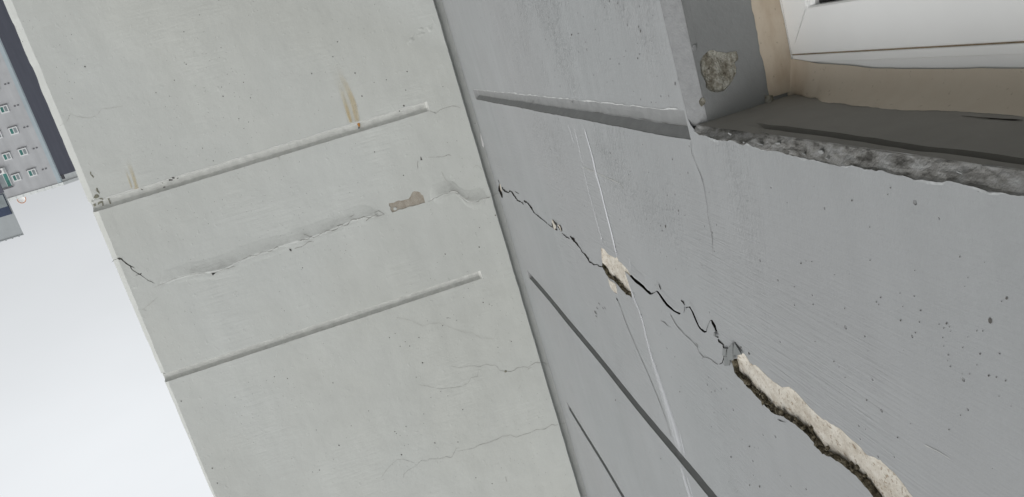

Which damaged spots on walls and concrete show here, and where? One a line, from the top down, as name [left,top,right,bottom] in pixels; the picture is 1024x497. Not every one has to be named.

spalling [699,50,738,107]
peeling [694,124,1024,197]
spalling [389,191,425,212]
crack [428,165,601,267]
crack [112,211,384,311]
spalling [601,248,632,298]
crack [616,275,724,435]